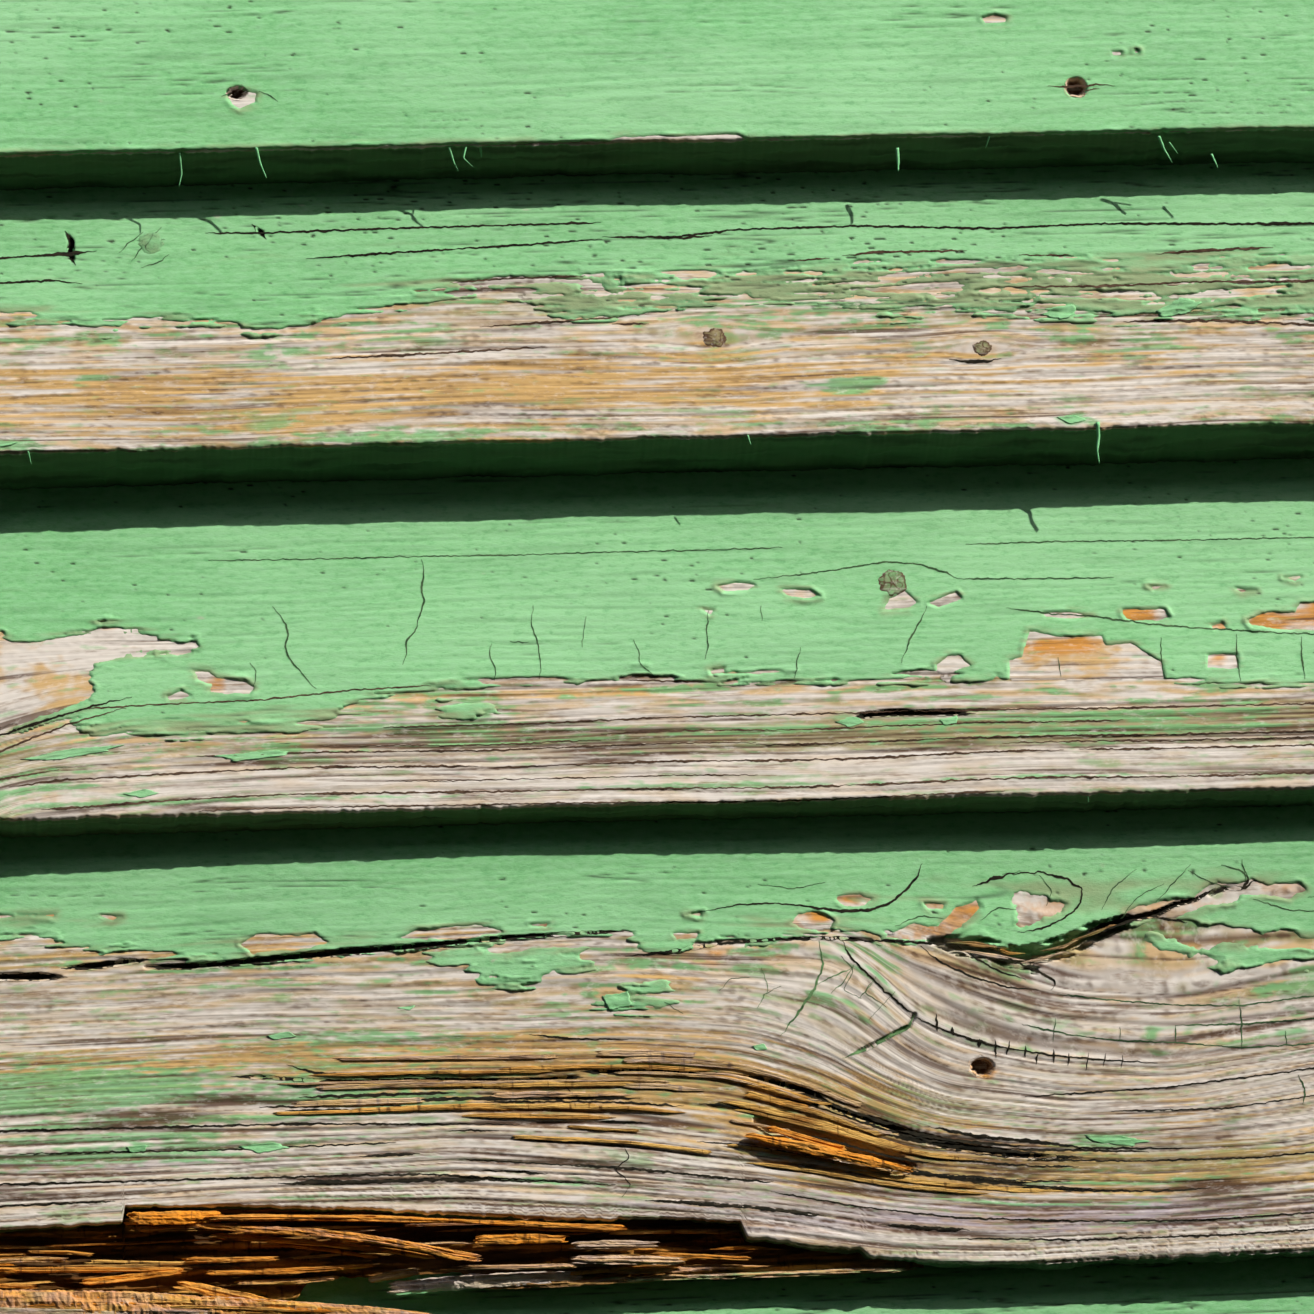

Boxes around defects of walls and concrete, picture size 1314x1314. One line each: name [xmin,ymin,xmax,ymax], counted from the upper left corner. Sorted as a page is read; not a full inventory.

crack [0,230,169,284]
peeling [0,254,1314,455]
peeling [719,583,754,591]
peeling [783,589,816,598]
peeling [885,591,961,609]
peeling [1123,609,1168,621]
peeling [1249,603,1314,630]
peeling [0,620,1314,822]
crack [0,863,1314,1112]
peeling [0,879,1314,1265]
crack [0,1034,1314,1242]